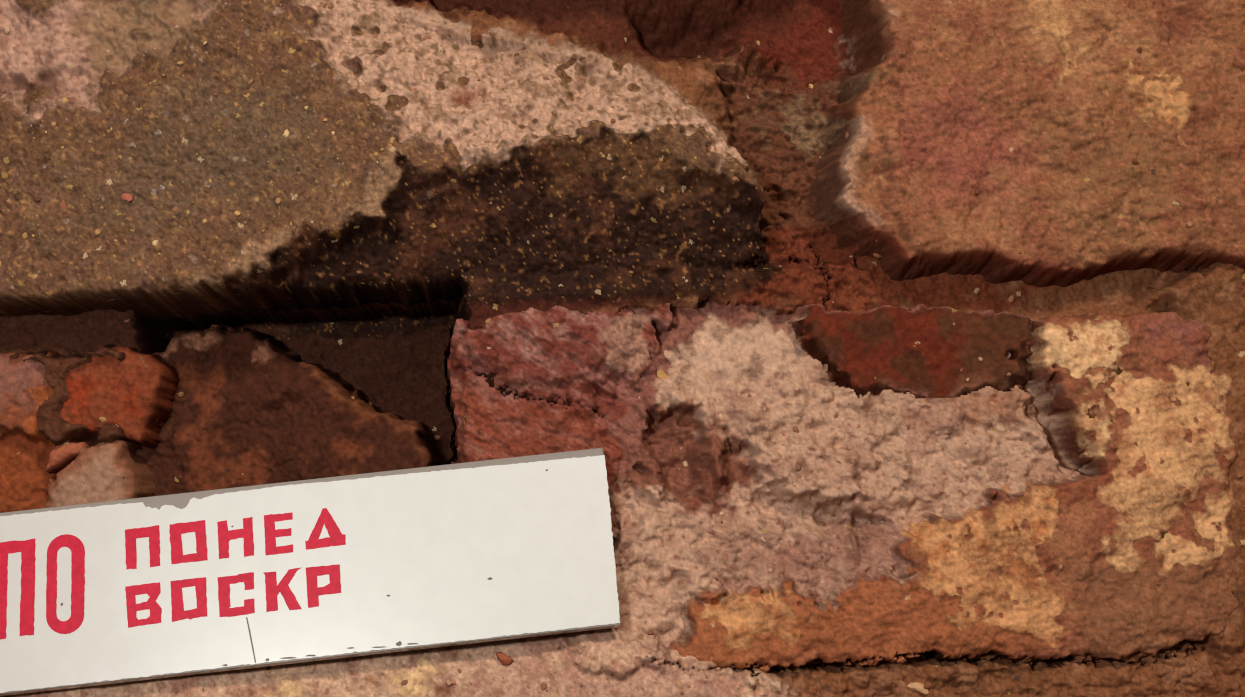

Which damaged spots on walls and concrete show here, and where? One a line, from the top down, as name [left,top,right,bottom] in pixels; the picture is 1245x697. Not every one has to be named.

spalling [611,305,1235,656]